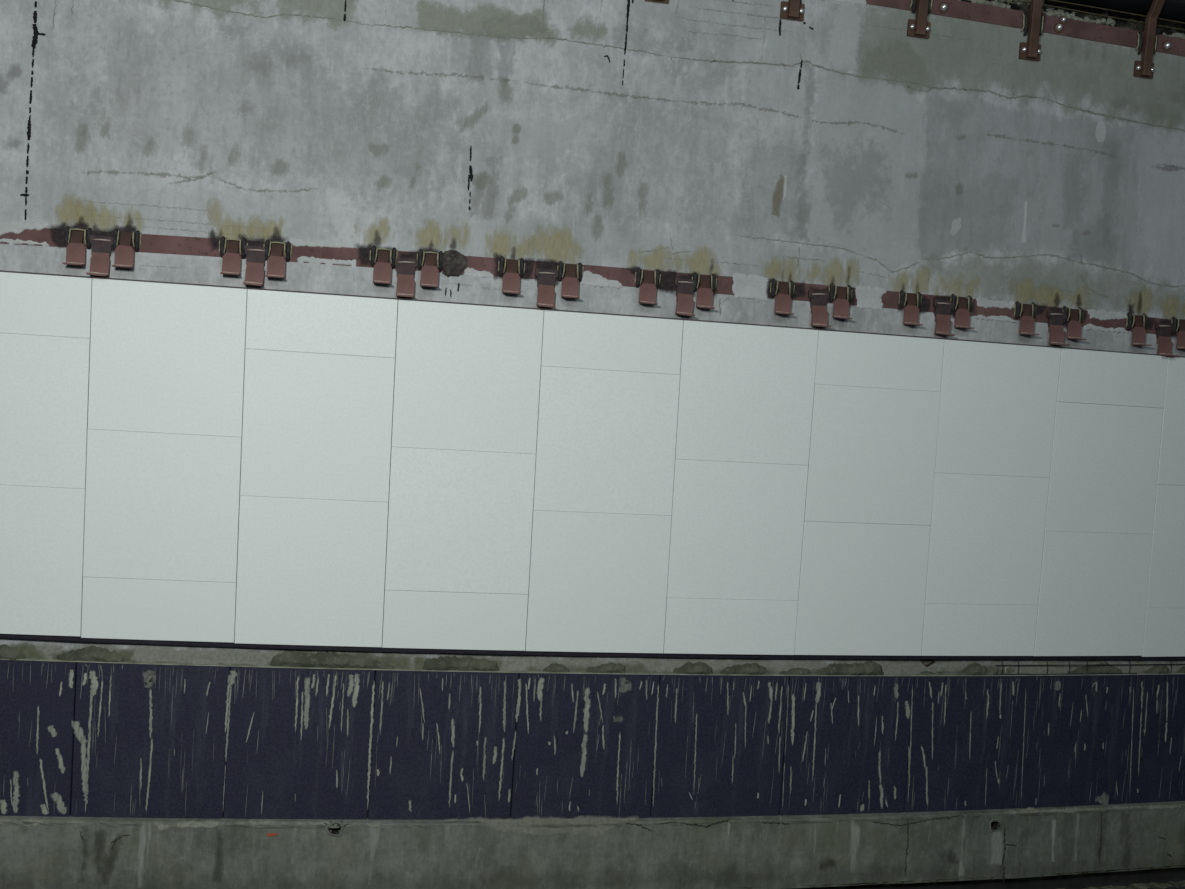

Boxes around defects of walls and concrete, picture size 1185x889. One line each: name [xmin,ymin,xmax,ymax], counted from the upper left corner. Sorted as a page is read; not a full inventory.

crack [174,0,1185,131]
water stain [212,204,282,241]
water stain [490,230,578,262]
water stain [631,246,718,274]
crack [736,235,1185,297]